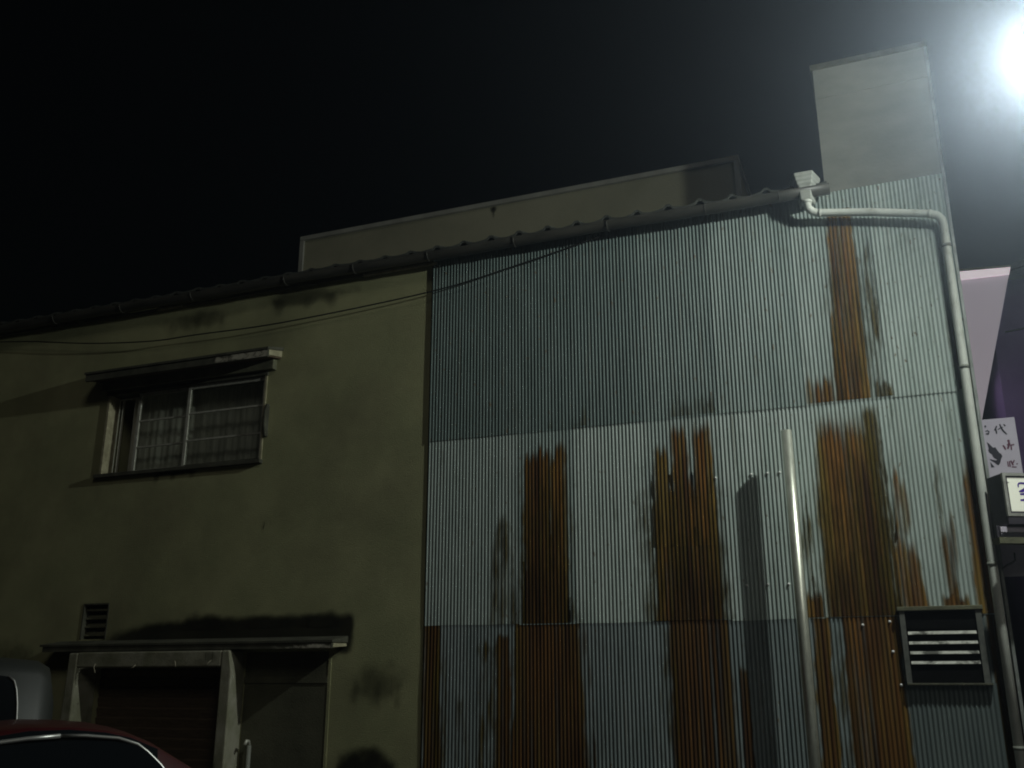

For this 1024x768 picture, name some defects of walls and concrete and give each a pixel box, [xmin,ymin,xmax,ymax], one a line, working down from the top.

rust [423,625,446,768]
rust [466,443,596,768]
rust [639,404,756,768]
rust [803,207,929,768]